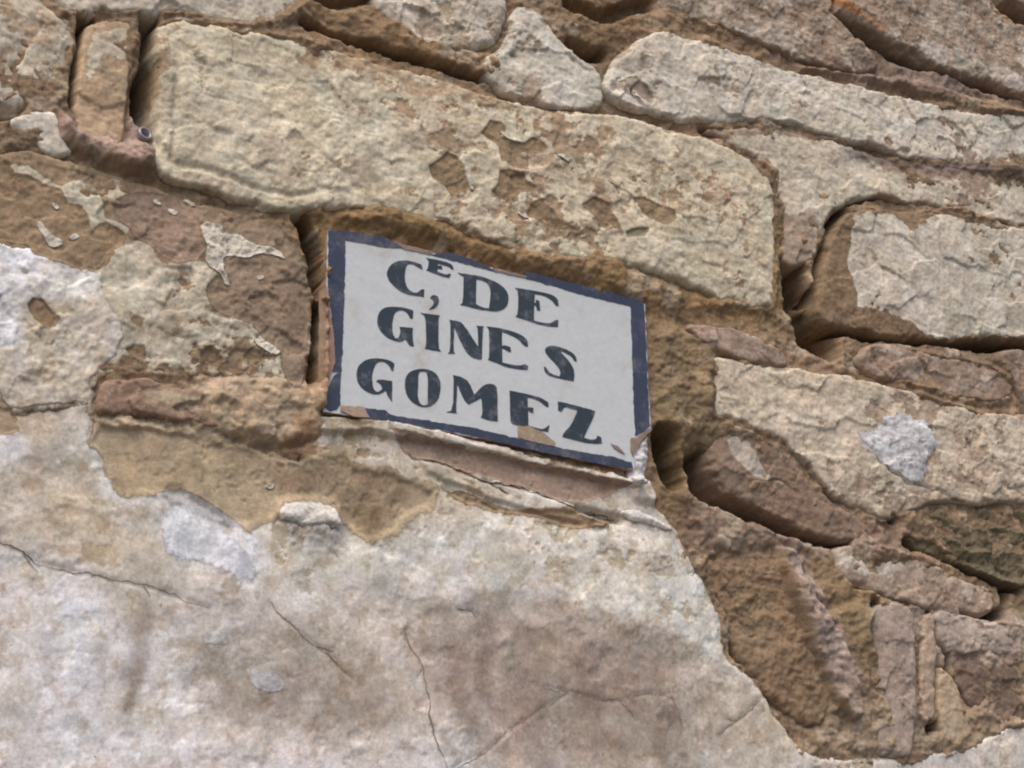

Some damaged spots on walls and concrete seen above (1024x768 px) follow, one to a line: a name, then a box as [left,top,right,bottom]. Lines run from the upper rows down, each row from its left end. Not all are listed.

peeling [0,161,310,388]
peeling [87,417,632,545]
crack [0,542,208,608]
crack [271,602,354,679]
crack [405,633,683,768]